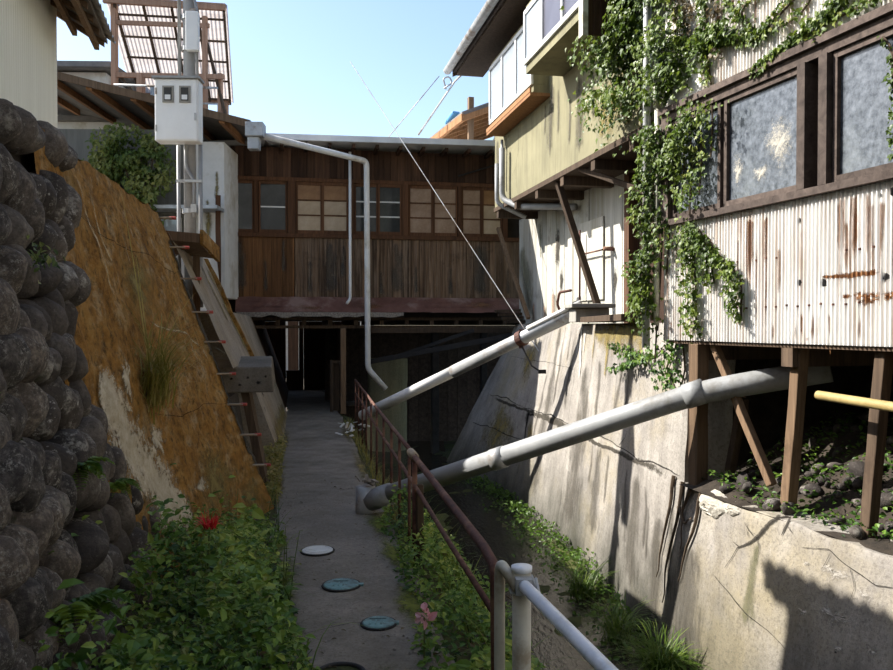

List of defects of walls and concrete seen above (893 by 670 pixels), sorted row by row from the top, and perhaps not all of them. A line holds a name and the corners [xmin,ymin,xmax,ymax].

rust [738,218,781,309]
rust [823,195,893,306]
crack [491,395,568,424]
damp [496,325,609,436]
damp [566,439,662,531]
crack [601,436,675,474]
damp [623,472,694,655]